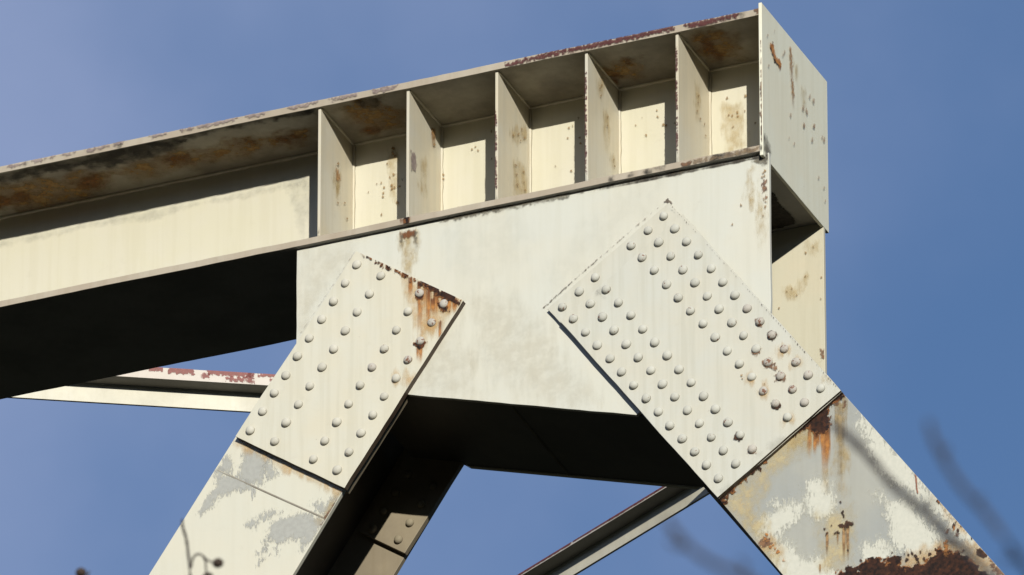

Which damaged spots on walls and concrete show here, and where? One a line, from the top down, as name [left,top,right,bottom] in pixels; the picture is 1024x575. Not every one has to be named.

corrosion [760,40,795,98]
corrosion [754,69,771,153]
corrosion [363,256,461,357]
corrosion [790,379,846,457]
peeling [198,447,280,517]
peeling [245,510,323,565]
corrosion [720,460,768,505]
peeling [750,474,843,575]
corrosion [819,501,1004,575]
peeling [855,412,1002,575]